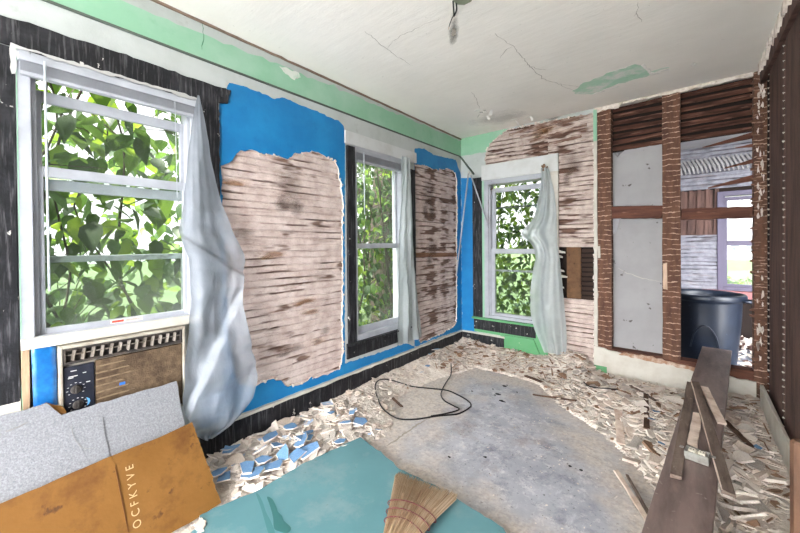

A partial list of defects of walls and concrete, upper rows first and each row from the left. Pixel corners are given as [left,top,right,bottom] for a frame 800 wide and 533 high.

peeling [280,67,301,80]
peeling [573,64,670,95]
flaking render [221,150,345,387]
flaking render [414,164,458,343]
flaking render [485,113,594,263]
flaking render [564,275,594,365]